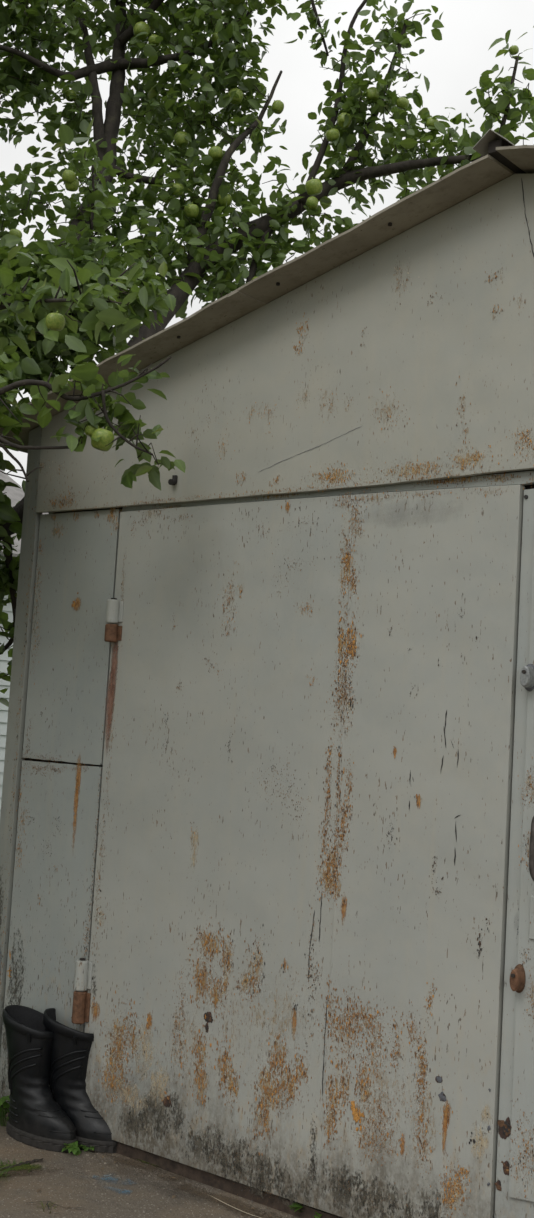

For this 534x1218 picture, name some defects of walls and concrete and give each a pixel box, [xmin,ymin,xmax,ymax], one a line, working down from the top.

corrosion [7,605,110,874]
corrosion [32,376,534,1218]
damp [118,1089,441,1218]